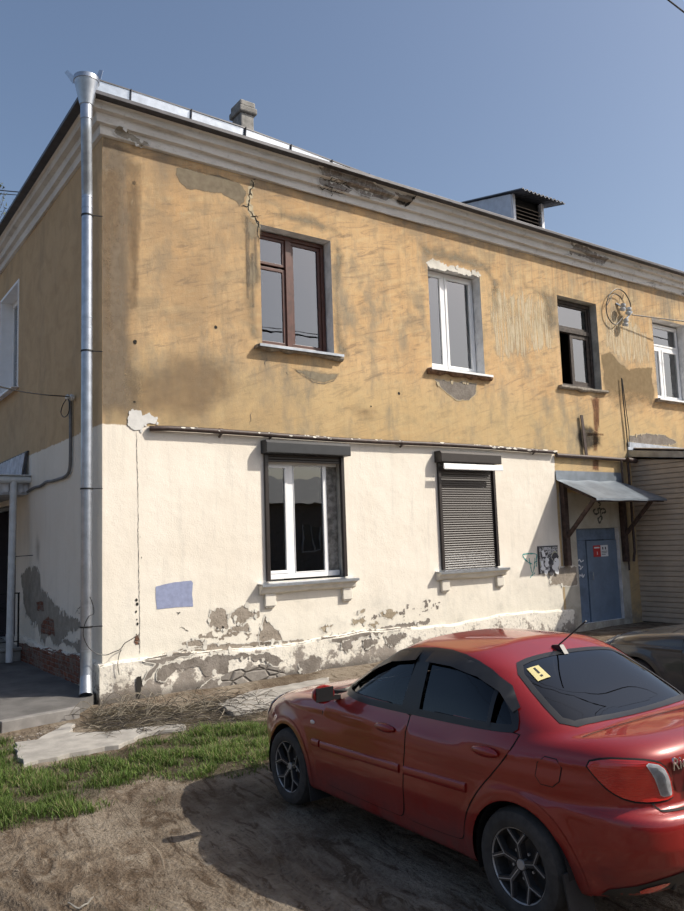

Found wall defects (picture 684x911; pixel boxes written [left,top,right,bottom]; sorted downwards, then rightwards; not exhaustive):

peeling [113,124,151,148]
damp [176,168,246,206]
crack [242,179,260,242]
damp [103,142,131,410]
damp [602,312,654,400]
peeling [19,565,80,684]
peeling [136,600,440,699]